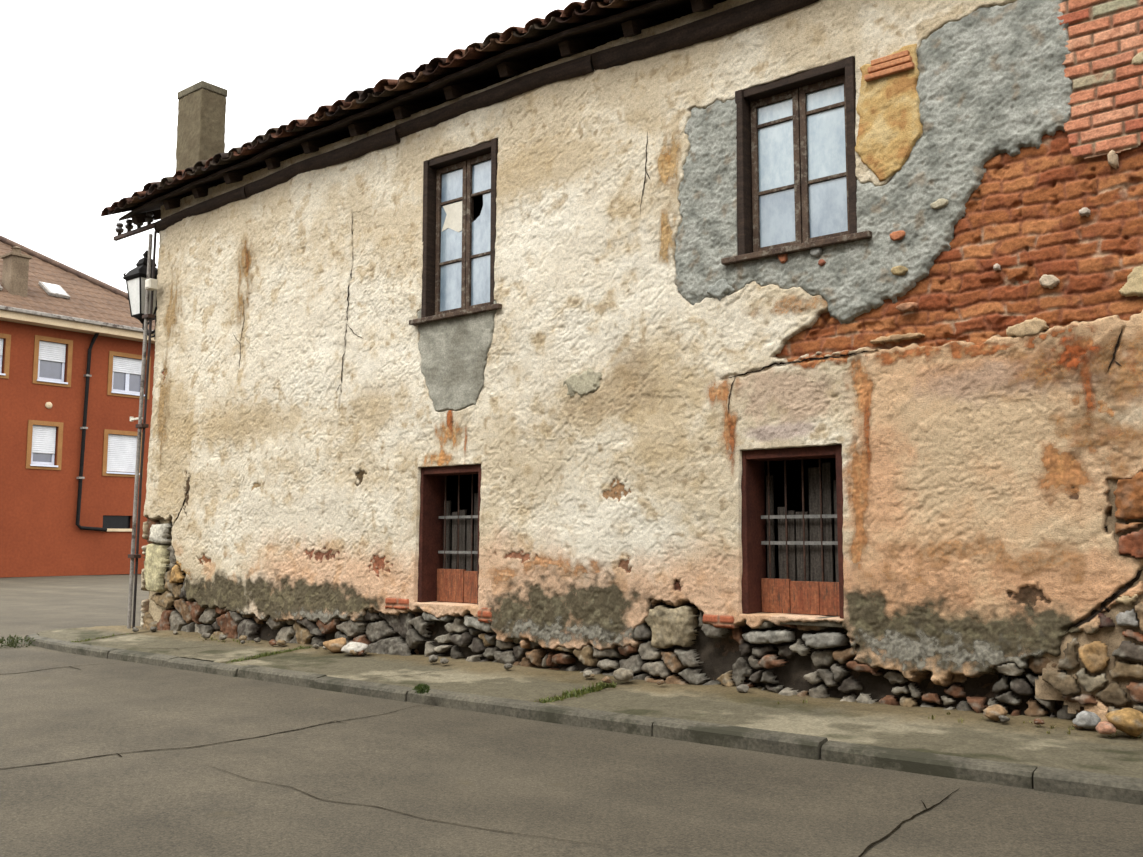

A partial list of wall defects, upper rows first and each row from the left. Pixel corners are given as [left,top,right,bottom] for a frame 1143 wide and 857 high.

flaking render [776,0,1143,362]
rust [708,379,737,463]
rust [794,326,1143,584]
leakage [488,576,640,648]